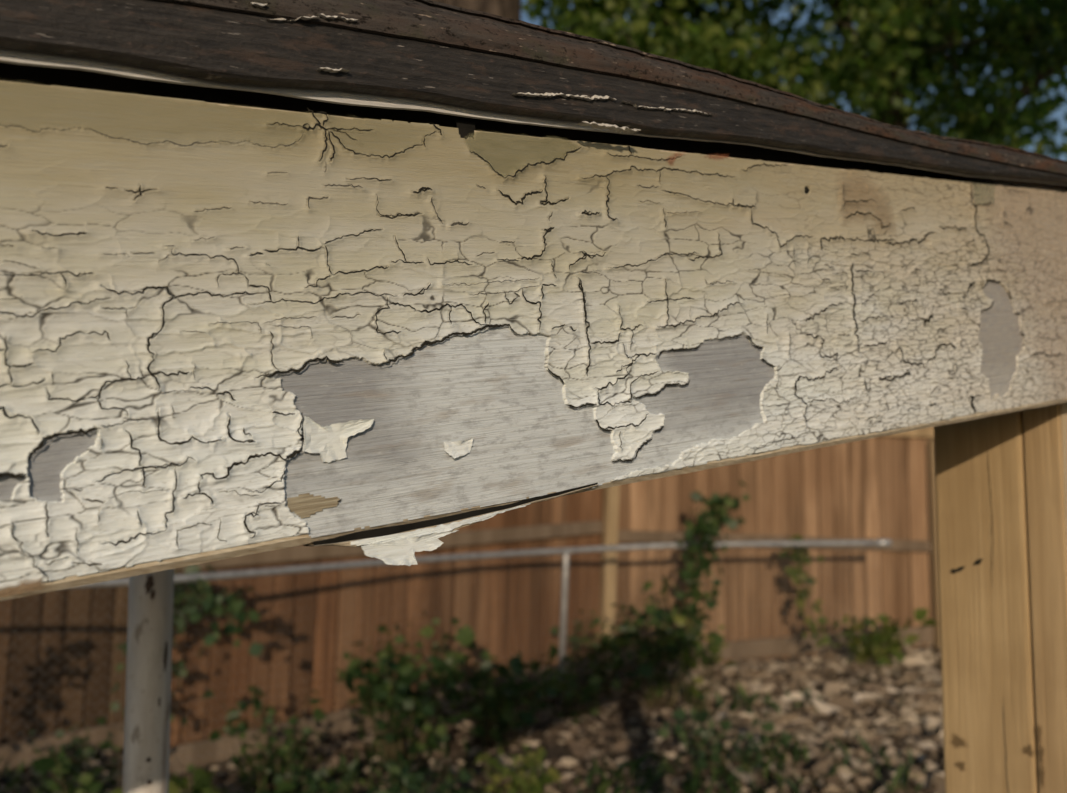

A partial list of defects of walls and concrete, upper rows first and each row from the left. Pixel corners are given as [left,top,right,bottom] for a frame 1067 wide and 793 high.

crack [0,108,1034,577]
peeling [978,279,1025,400]
crack [1030,300,1067,357]
peeling [0,428,98,502]
peeling [266,324,775,538]
peeling [361,530,458,566]